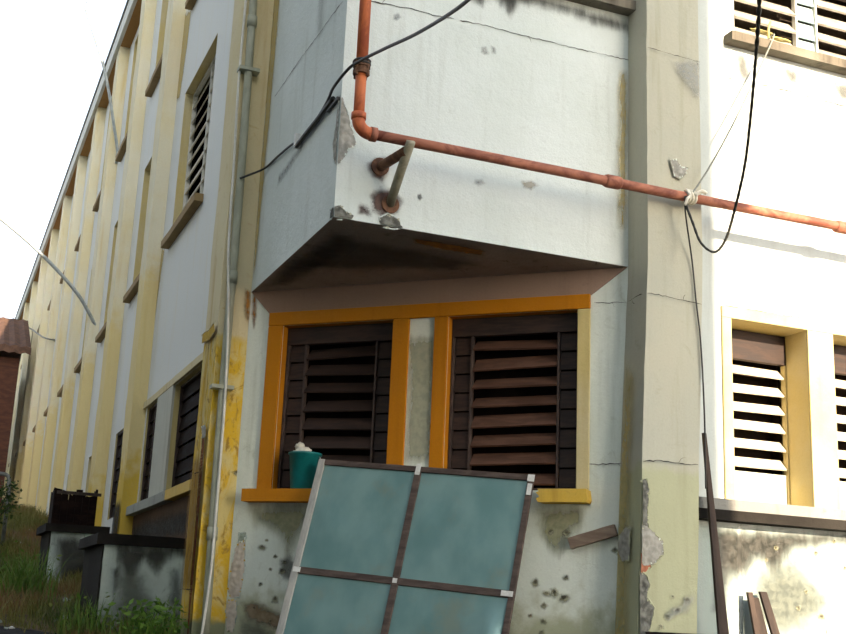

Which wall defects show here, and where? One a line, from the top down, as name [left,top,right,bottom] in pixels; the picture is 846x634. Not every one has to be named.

water stain [501,0,625,29]
crack [371,1,628,60]
flaking render [332,98,357,164]
flaking render [329,204,354,220]
corrosion [360,191,400,215]
flaking render [378,213,403,230]
crack [595,293,699,304]
crack [643,457,698,465]
water stain [132,511,189,537]
flaking render [640,477,690,634]
water stain [115,545,186,628]
water stain [718,526,846,634]